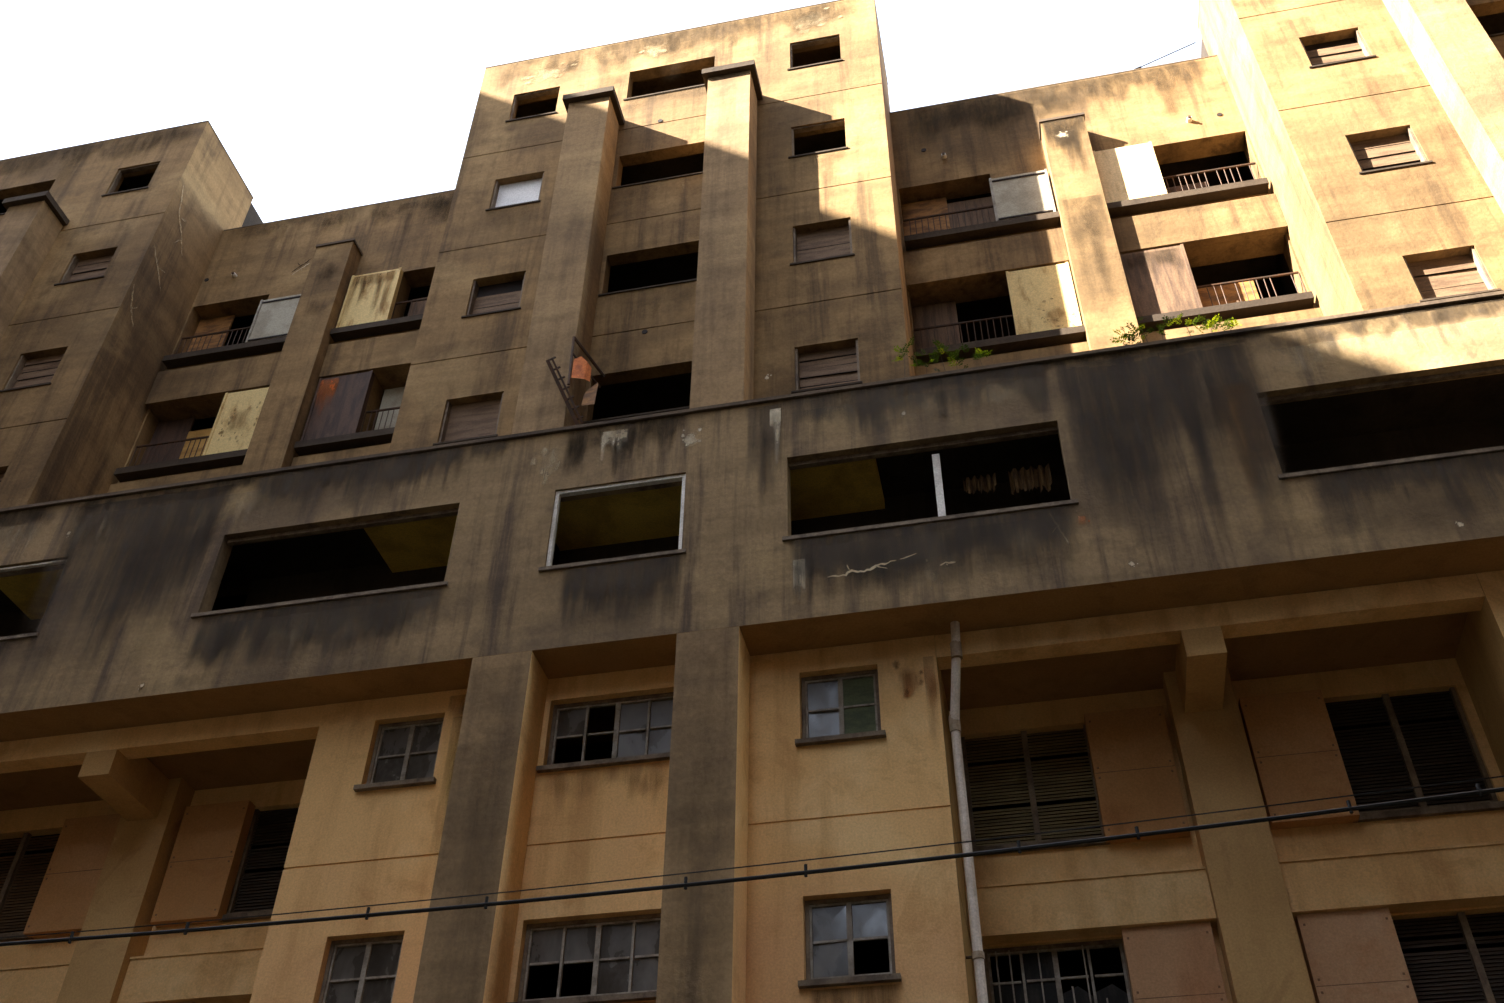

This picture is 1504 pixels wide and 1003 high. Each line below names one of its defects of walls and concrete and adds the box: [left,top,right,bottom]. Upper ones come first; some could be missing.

leakage [915,60,1196,148]
leakage [570,415,681,460]
leakage [760,334,1260,477]
leakage [85,441,501,508]
leakage [1326,451,1504,493]
leakage [0,507,46,525]
crack [828,553,955,577]
leakage [793,507,1062,586]
leakage [195,588,438,659]